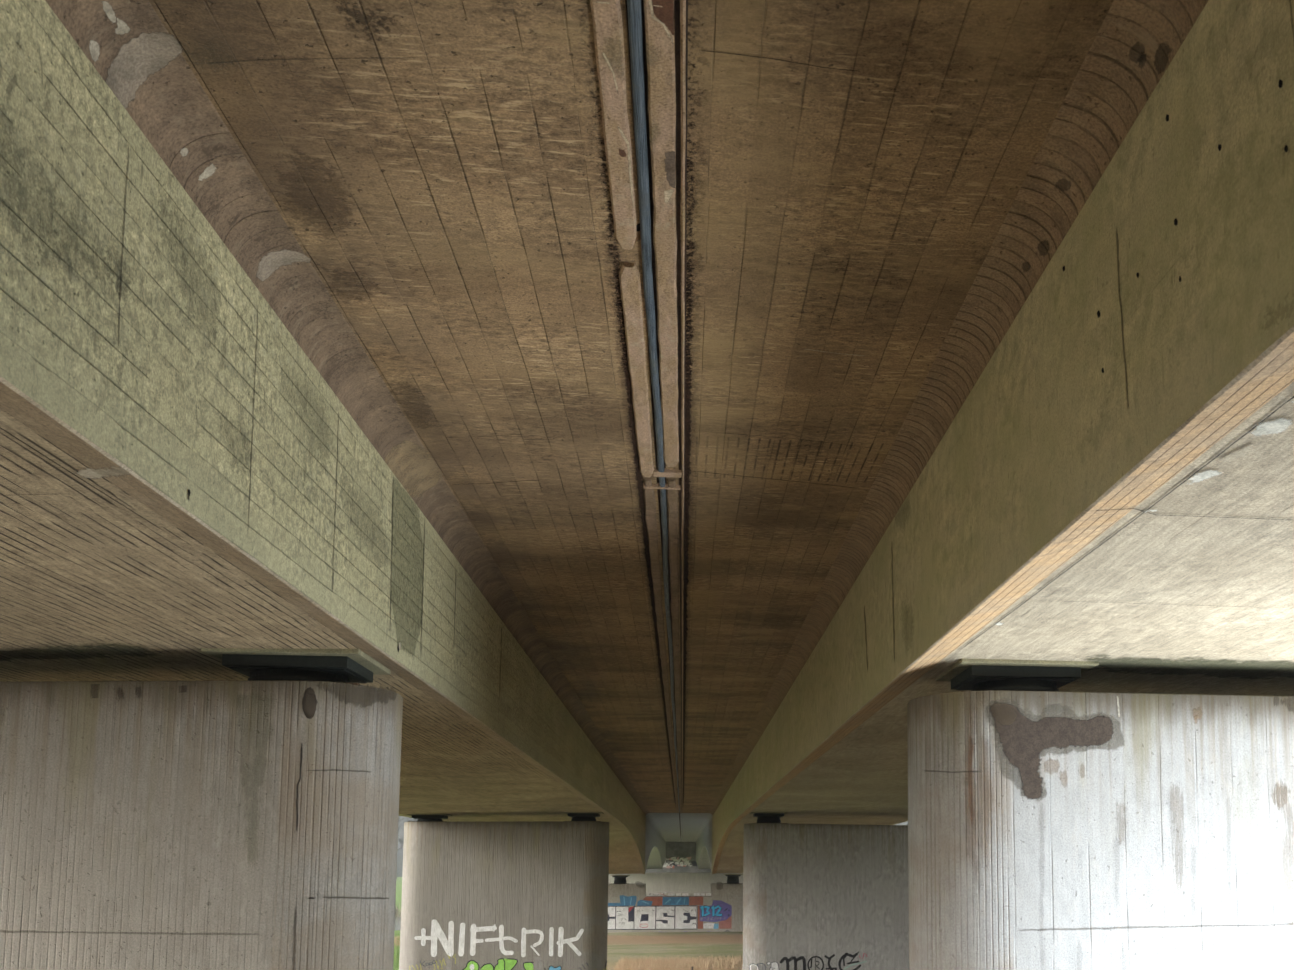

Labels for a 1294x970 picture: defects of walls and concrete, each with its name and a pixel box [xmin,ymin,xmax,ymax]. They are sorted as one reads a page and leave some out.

peeling [102,1,130,34]
damp [335,0,395,39]
peeling [649,0,674,41]
peeling [89,40,99,62]
damp [1129,42,1170,74]
peeling [198,164,217,180]
peeling [618,128,634,205]